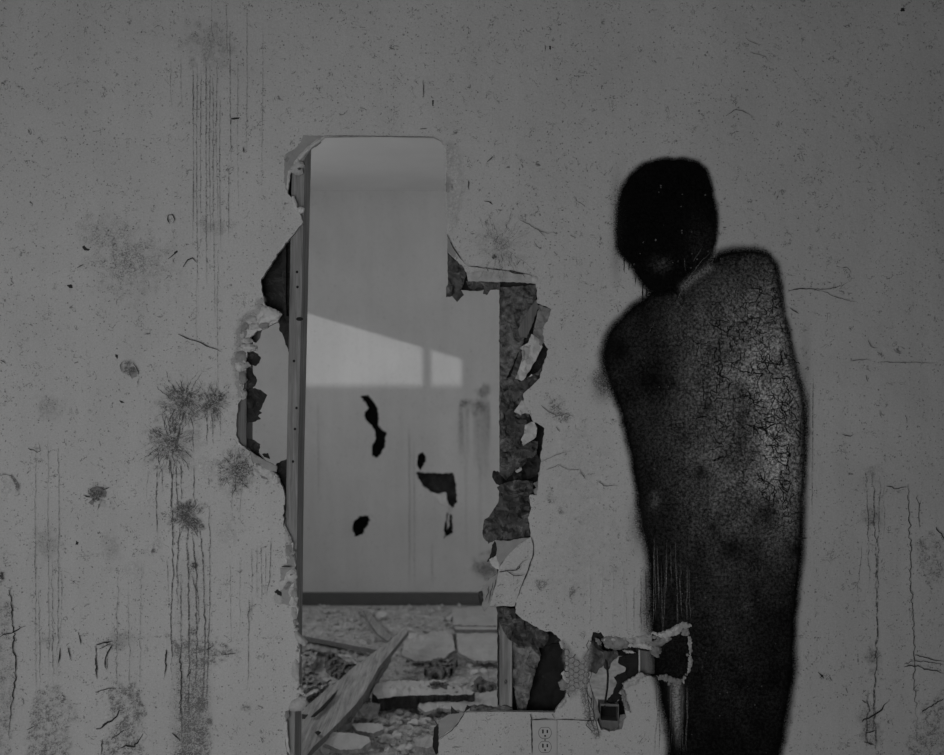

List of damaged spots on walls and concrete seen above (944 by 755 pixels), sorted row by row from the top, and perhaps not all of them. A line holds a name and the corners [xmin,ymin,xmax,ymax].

spalling [284,135,325,214]
spalling [467,266,538,284]
spalling [231,300,282,400]
spalling [243,449,280,485]
crack [0,593,25,739]
damp [141,375,253,755]
spalling [273,505,308,754]
peeling [432,705,471,754]
spalling [557,621,693,737]
crack [862,690,890,745]
crack [887,486,941,738]